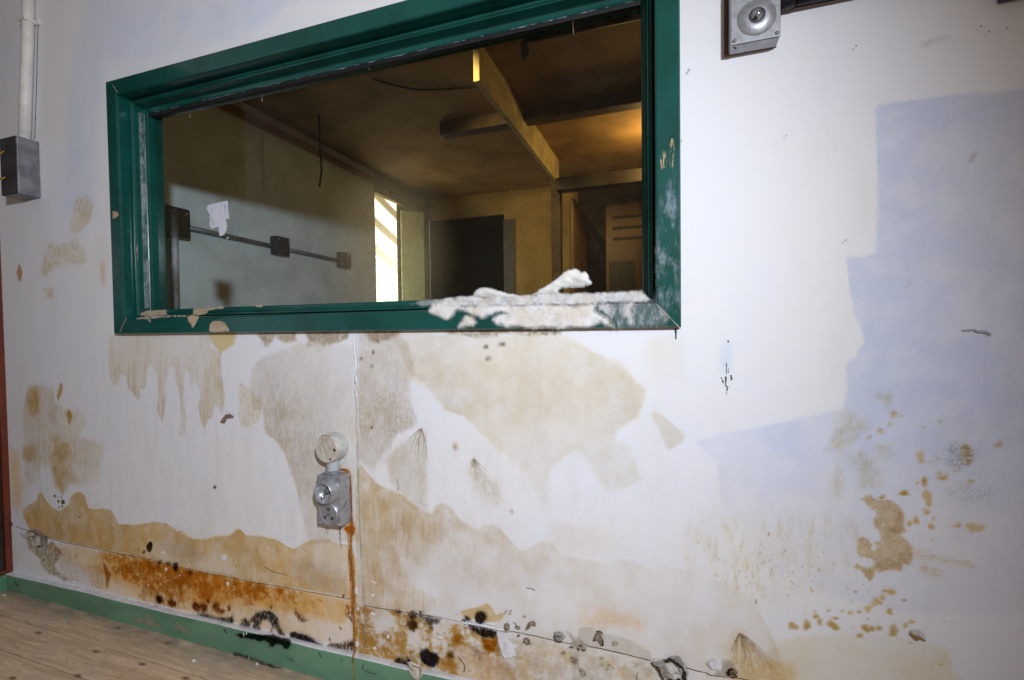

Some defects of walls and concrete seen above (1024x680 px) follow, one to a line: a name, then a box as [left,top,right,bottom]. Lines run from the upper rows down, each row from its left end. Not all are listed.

peeling [136,306,229,332]
peeling [429,303,614,328]
corrosion [326,468,356,680]
damp [193,600,354,650]
damp [397,611,440,632]
damp [462,611,497,650]
damp [394,648,453,667]
damp [731,633,780,675]